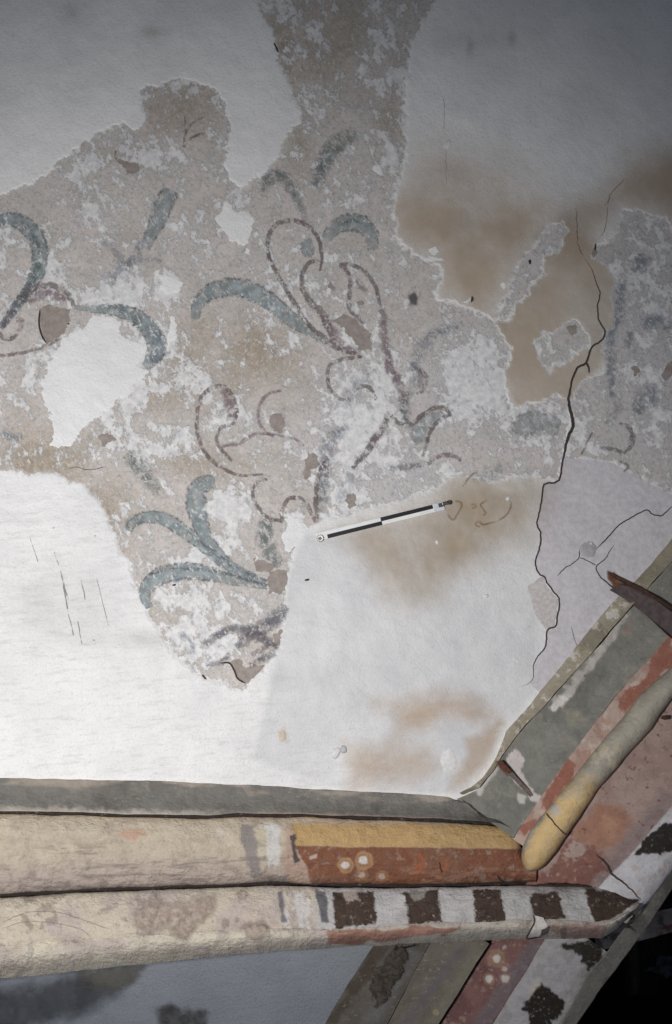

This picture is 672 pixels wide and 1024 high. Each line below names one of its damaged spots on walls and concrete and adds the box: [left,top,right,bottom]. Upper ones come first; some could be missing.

peeling [0,0,672,692]
damp [402,203,529,306]
damp [499,230,613,403]
damp [422,478,522,577]
crack [523,232,671,686]